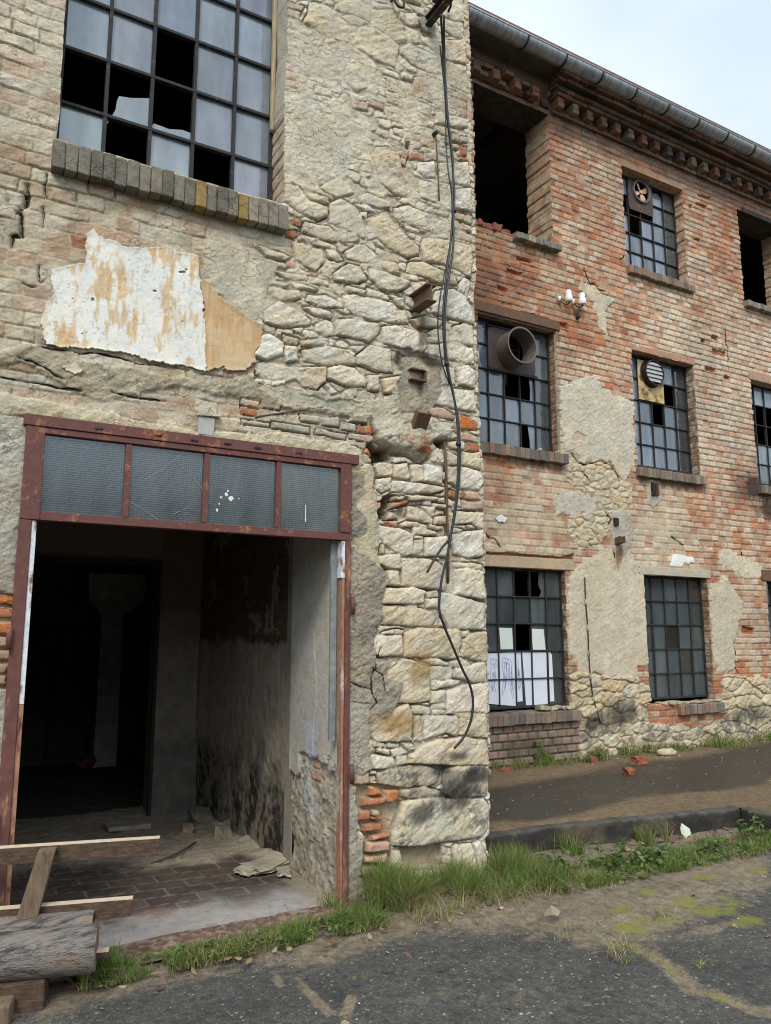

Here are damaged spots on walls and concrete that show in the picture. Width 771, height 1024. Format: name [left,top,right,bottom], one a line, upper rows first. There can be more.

crack [11,173,48,248]
peeling [0,229,374,420]
flaking render [559,375,636,480]
flaking render [553,489,599,519]
flaking render [709,576,755,678]
crack [351,647,387,710]